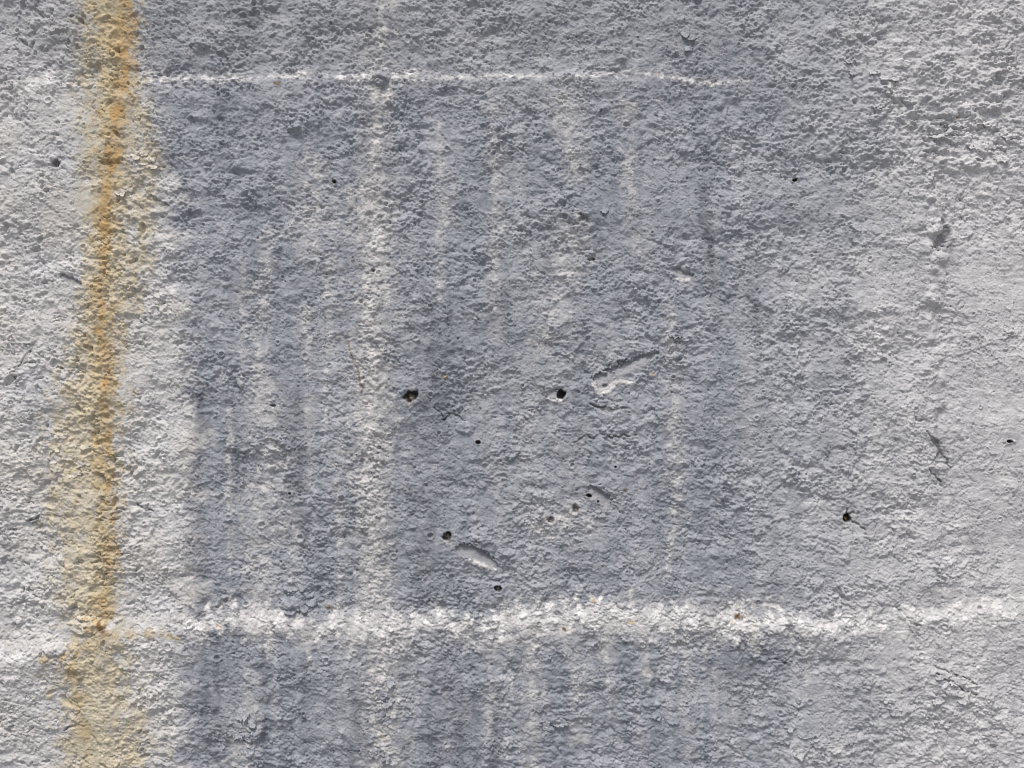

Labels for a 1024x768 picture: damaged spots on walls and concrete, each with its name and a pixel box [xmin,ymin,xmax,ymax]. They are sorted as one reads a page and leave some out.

corrosion [47,0,149,768]